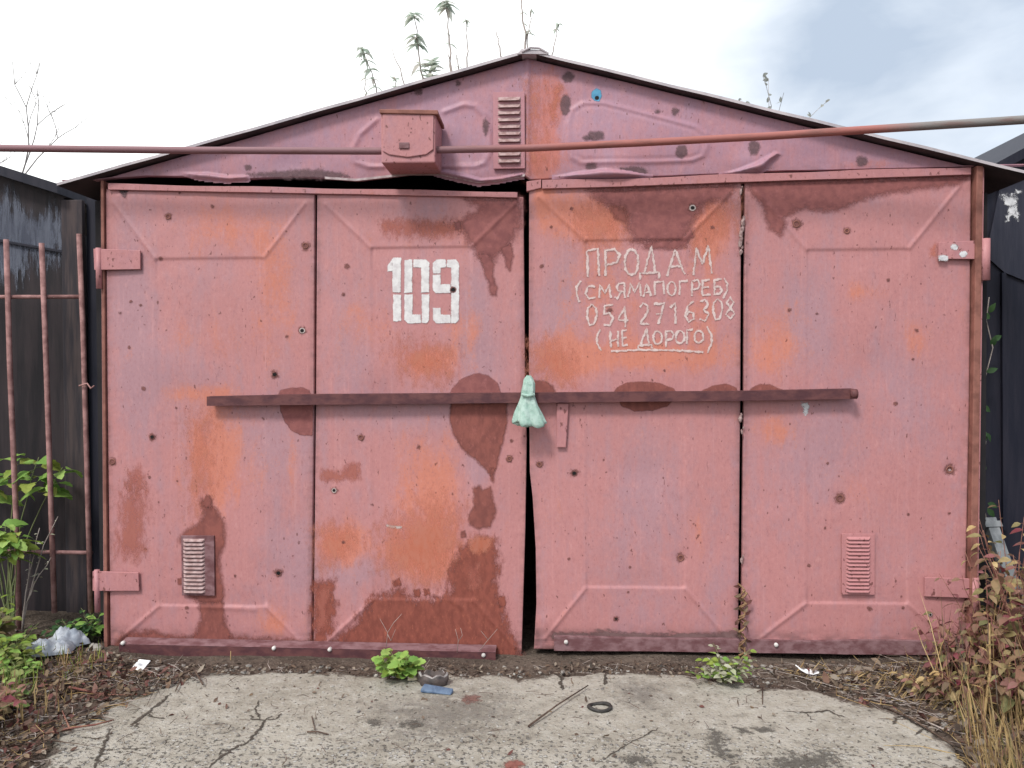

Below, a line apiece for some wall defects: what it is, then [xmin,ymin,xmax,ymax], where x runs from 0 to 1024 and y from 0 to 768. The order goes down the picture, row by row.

rust [455,197,523,295]
rust [592,183,736,250]
rust [749,175,970,236]
rust [279,387,313,436]
rust [614,369,675,412]
rust [308,373,522,656]
rust [182,495,236,639]
crack [209,700,282,768]